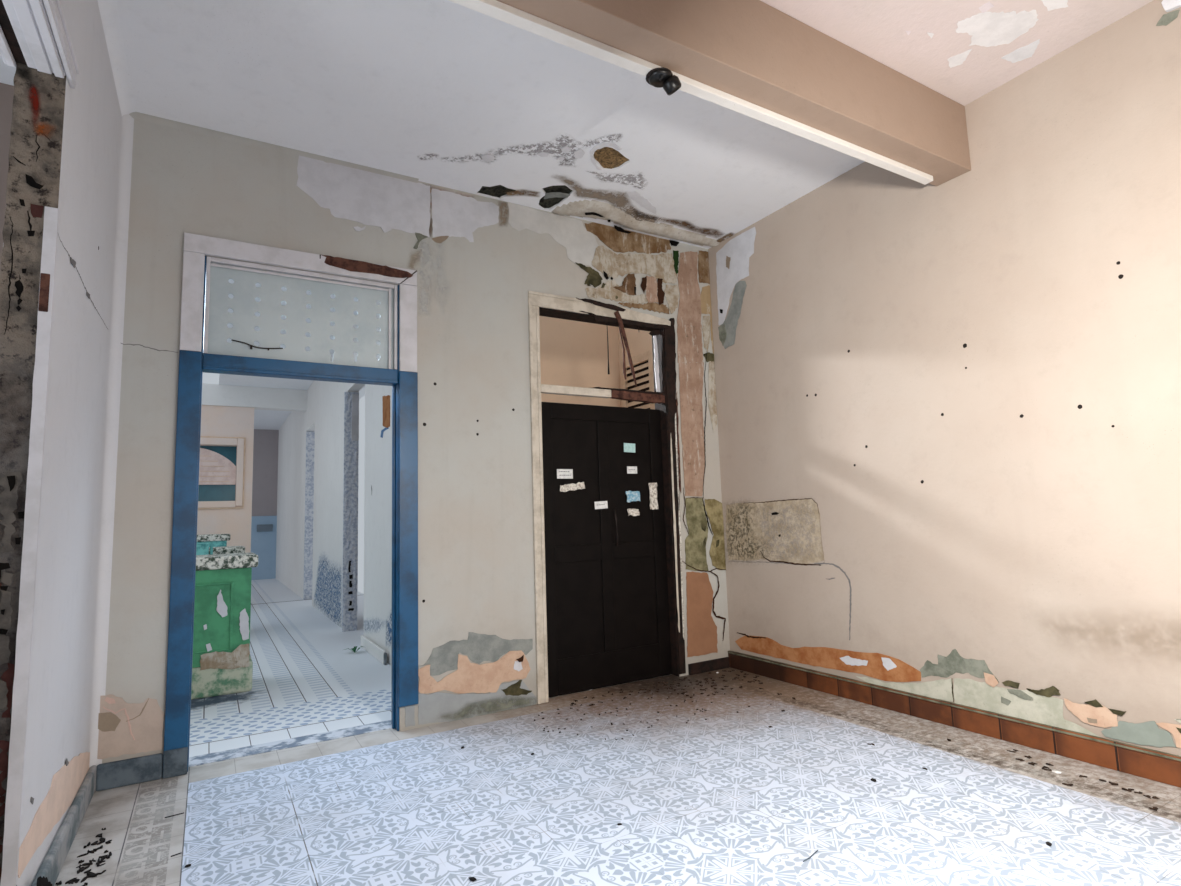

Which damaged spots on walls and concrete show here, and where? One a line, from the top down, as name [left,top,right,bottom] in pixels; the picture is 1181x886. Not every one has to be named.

peeling [947,0,1068,68]
peeling [1156,0,1181,26]
crack [13,134,51,166]
flaking render [594,147,629,169]
crack [4,211,178,353]
peeling [297,155,756,497]
spalling [0,472,24,718]
flaking render [686,571,718,657]
flaking render [405,632,537,727]
flaking render [735,632,1181,756]
flaking render [0,740,10,817]
flaking render [18,694,165,878]